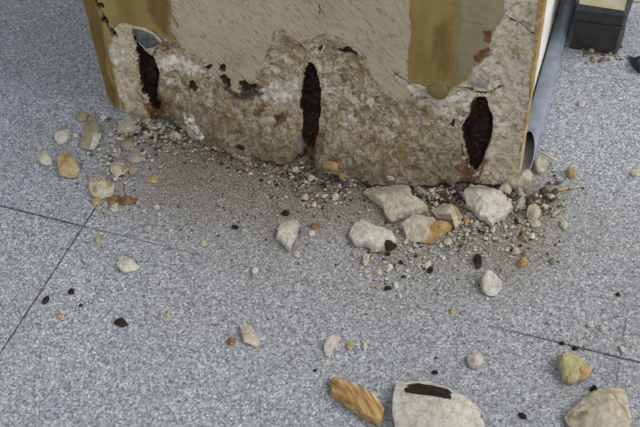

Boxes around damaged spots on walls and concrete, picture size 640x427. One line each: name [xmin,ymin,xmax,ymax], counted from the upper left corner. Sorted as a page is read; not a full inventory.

corrosion [134,35,166,118]
corrosion [299,62,321,159]
spalling [88,0,539,205]
damp [407,0,505,121]
corrosion [458,96,493,185]
corrosion [474,31,492,63]
crack [464,85,504,94]